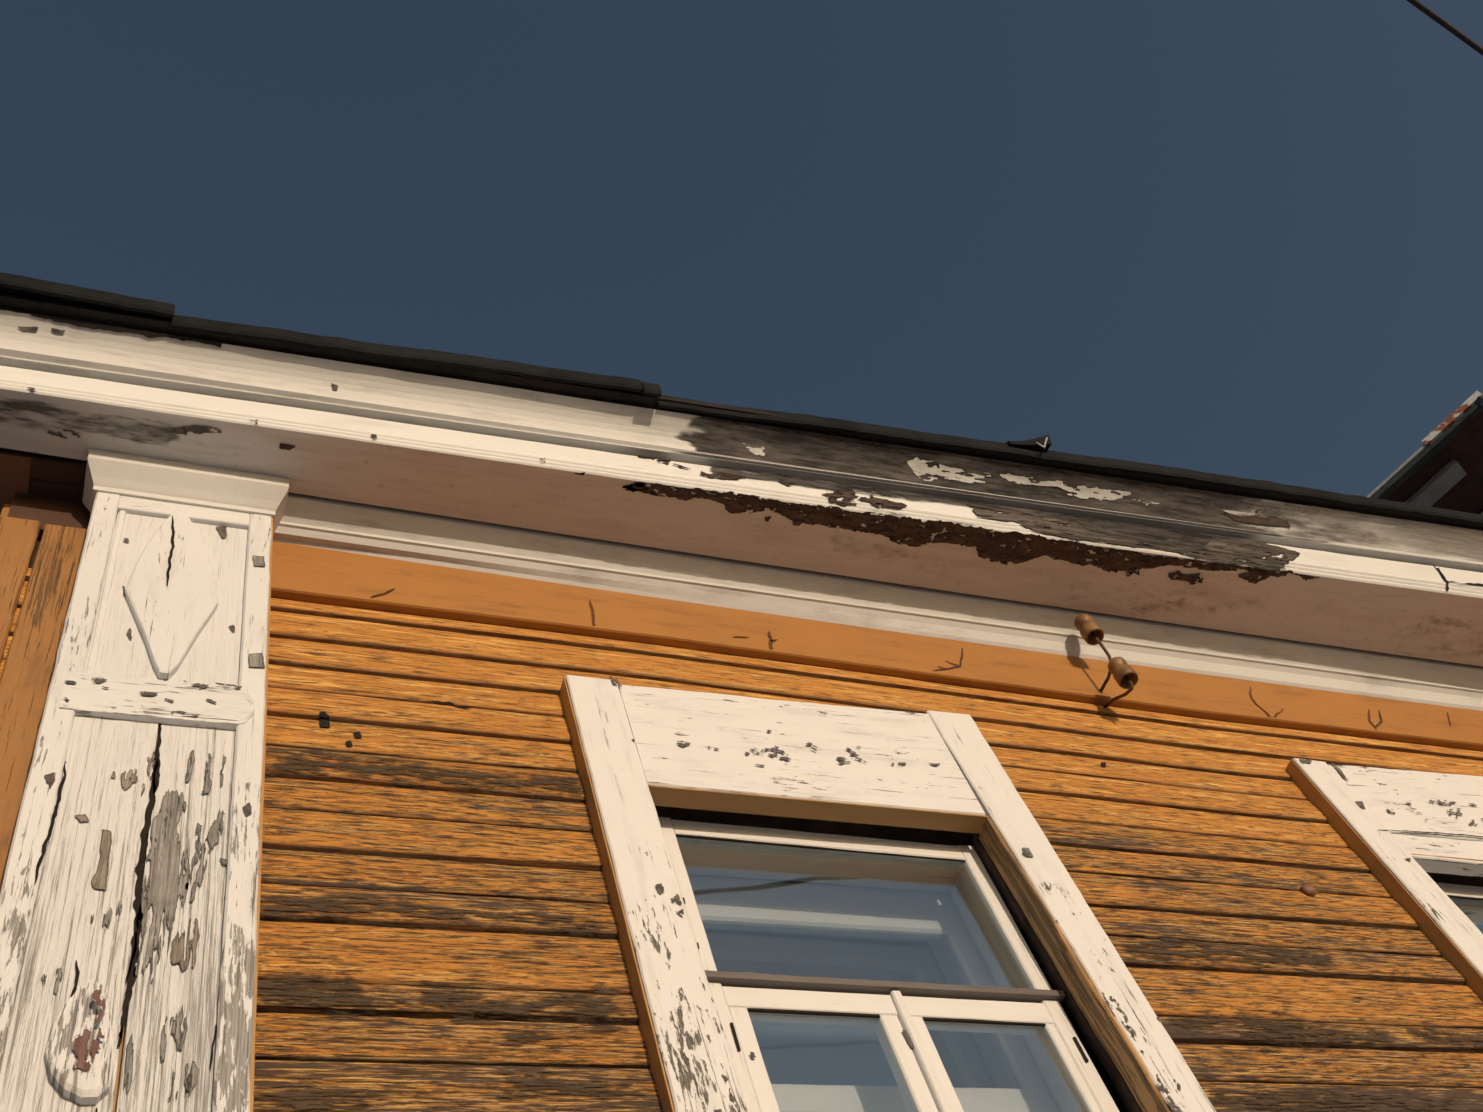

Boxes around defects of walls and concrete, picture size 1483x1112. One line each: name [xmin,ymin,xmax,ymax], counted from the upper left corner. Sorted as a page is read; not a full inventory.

crack [167,516,175,586]
peeling [622,455,1320,585]
water stain [676,416,1374,551]
crack [1433,565,1483,591]
spalling [139,680,243,716]
spalling [44,772,55,788]
crack [117,727,162,1047]
peeling [75,750,227,983]
spalling [655,883,684,917]
peeling [73,989,134,1093]
peeling [160,1005,199,1101]
crack [209,1025,217,1070]